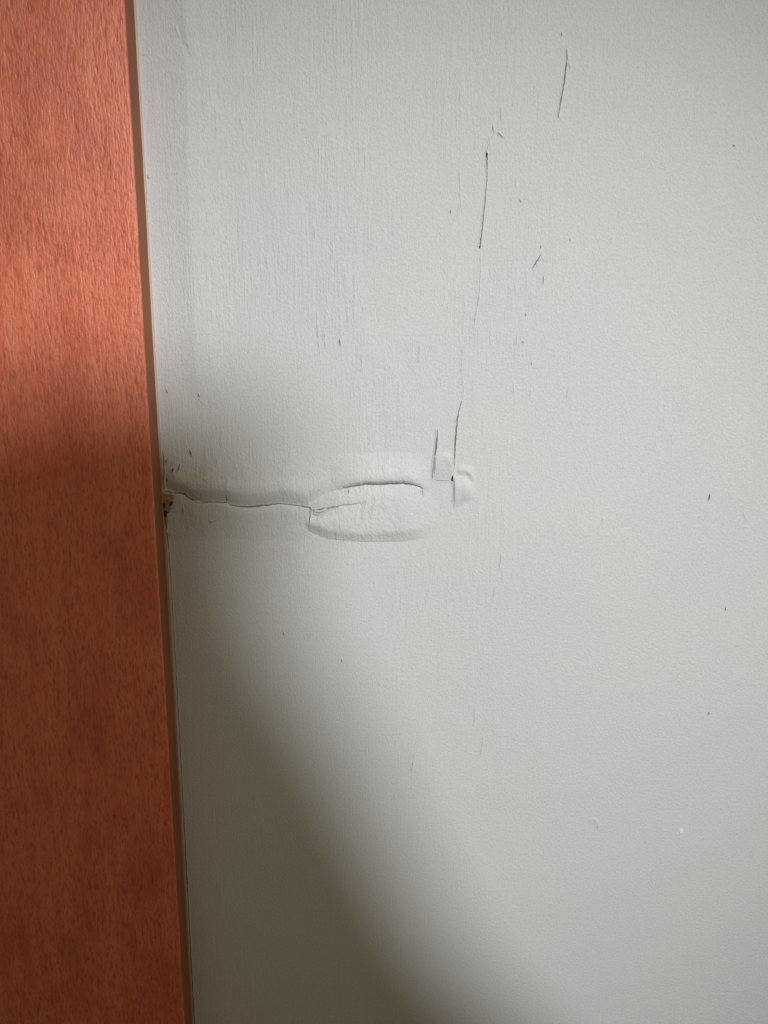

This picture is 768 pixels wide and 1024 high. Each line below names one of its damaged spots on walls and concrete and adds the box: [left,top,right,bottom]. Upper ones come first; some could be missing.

crack [162,399,464,1024]